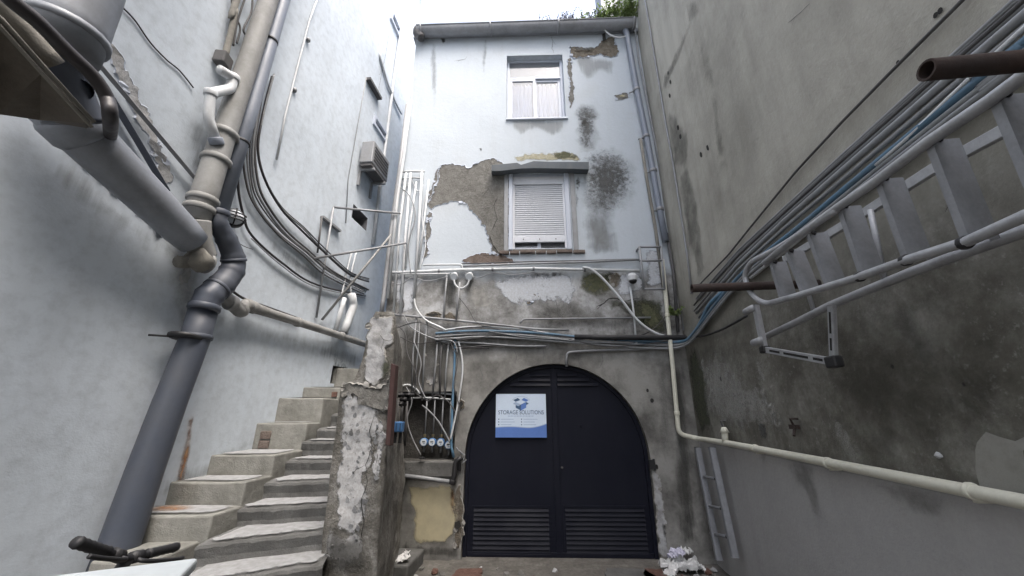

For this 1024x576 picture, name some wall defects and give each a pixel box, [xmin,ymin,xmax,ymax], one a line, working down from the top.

spalling [566,33,619,108]
flaking render [110,43,174,184]
leakage [579,109,595,144]
flaking render [422,151,579,265]
leakage [576,157,628,205]
corrosion [179,419,193,481]
peeling [325,278,421,566]
peeling [409,484,465,549]